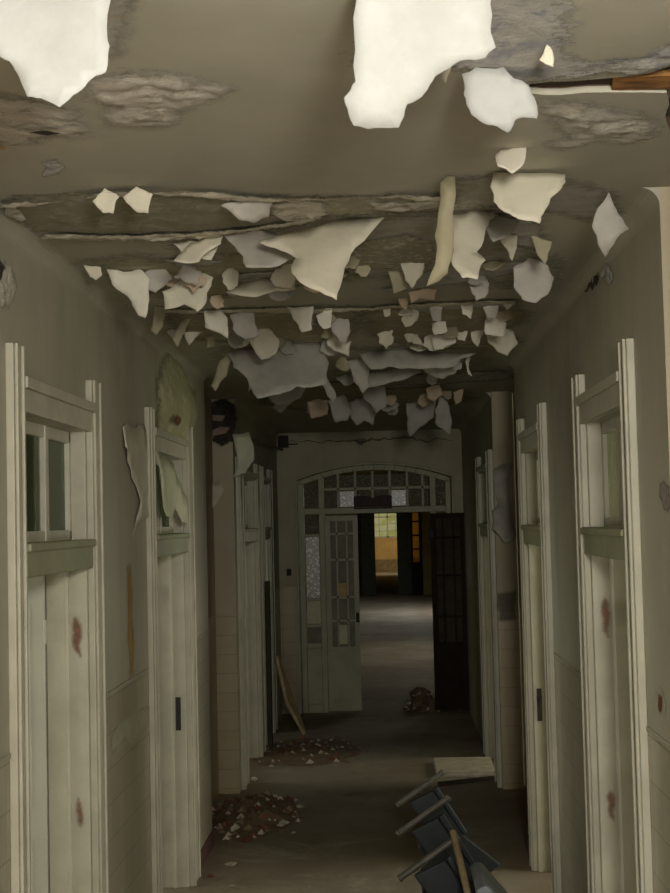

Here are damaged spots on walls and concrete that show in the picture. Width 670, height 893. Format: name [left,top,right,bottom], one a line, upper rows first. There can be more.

peeling [0,0,235,150]
peeling [344,0,670,148]
peeling [0,147,628,477]
peeling [122,423,188,536]